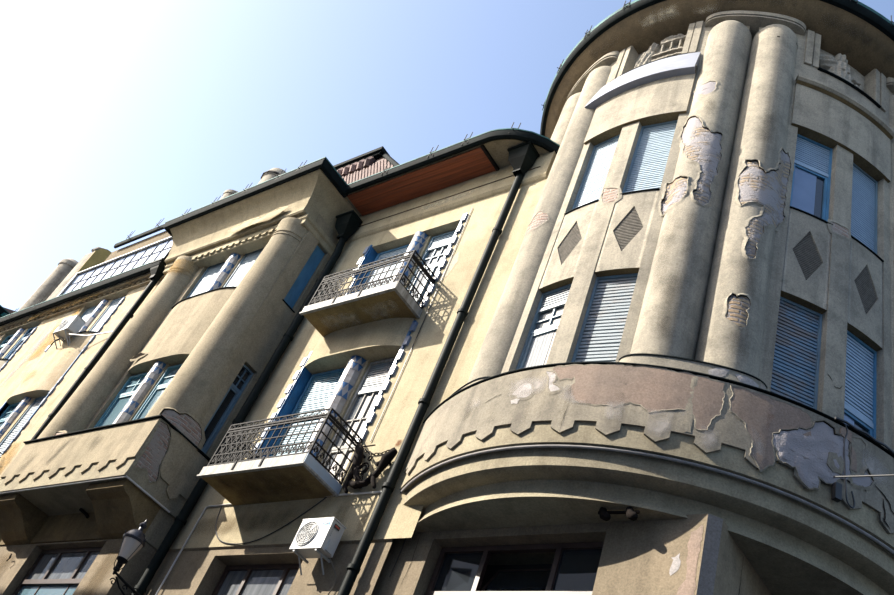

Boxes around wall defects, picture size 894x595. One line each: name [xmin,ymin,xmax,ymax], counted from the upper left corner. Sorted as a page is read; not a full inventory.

spalling [658,115,725,217]
spalling [734,147,794,262]
spalling [721,292,755,331]
spalling [132,407,206,485]
peeling [509,364,876,491]